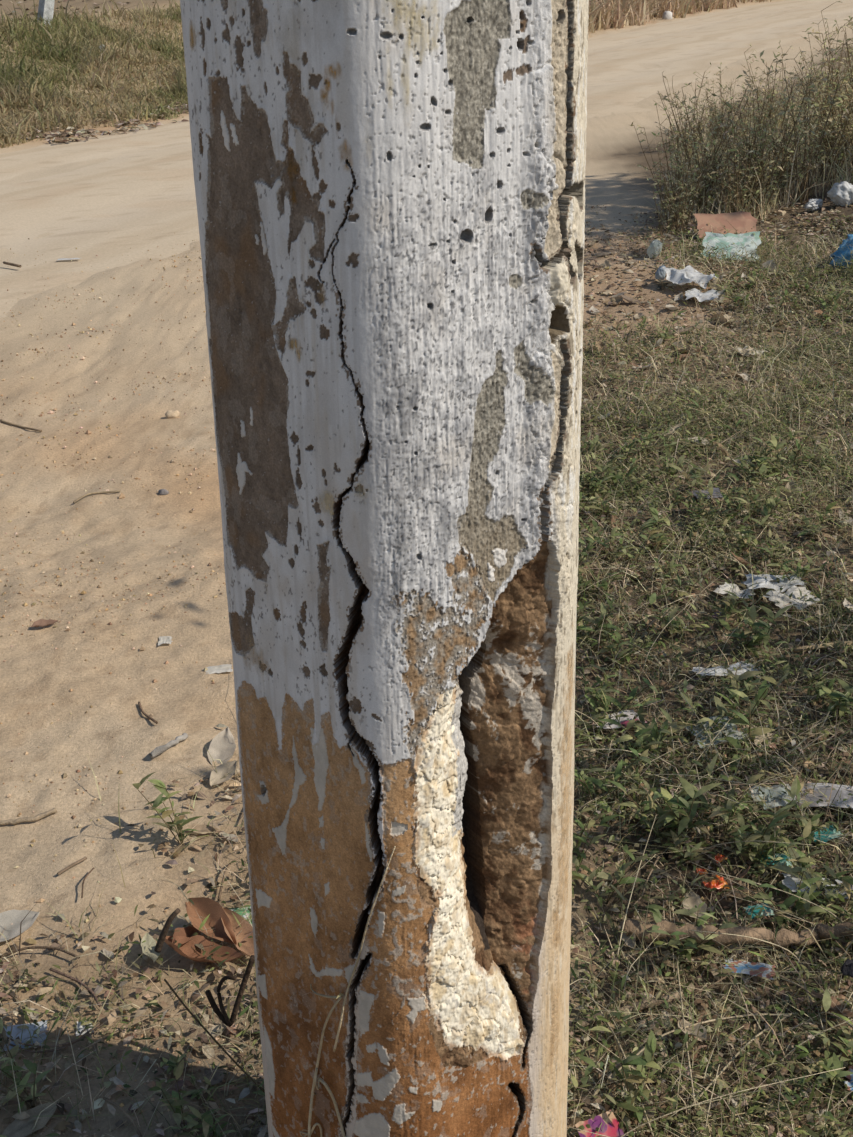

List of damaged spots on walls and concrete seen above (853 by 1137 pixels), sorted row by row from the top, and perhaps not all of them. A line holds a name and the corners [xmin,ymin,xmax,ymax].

spalling [379,32,404,41]
peeling [430,0,537,169]
peeling [520,0,574,258]
peeling [197,0,341,676]
peeling [345,252,360,268]
spalling [428,219,473,248]
spalling [485,207,493,224]
peeling [509,274,523,290]
crack [317,159,386,1137]
spalling [237,340,580,1137]
crack [498,964,533,1137]